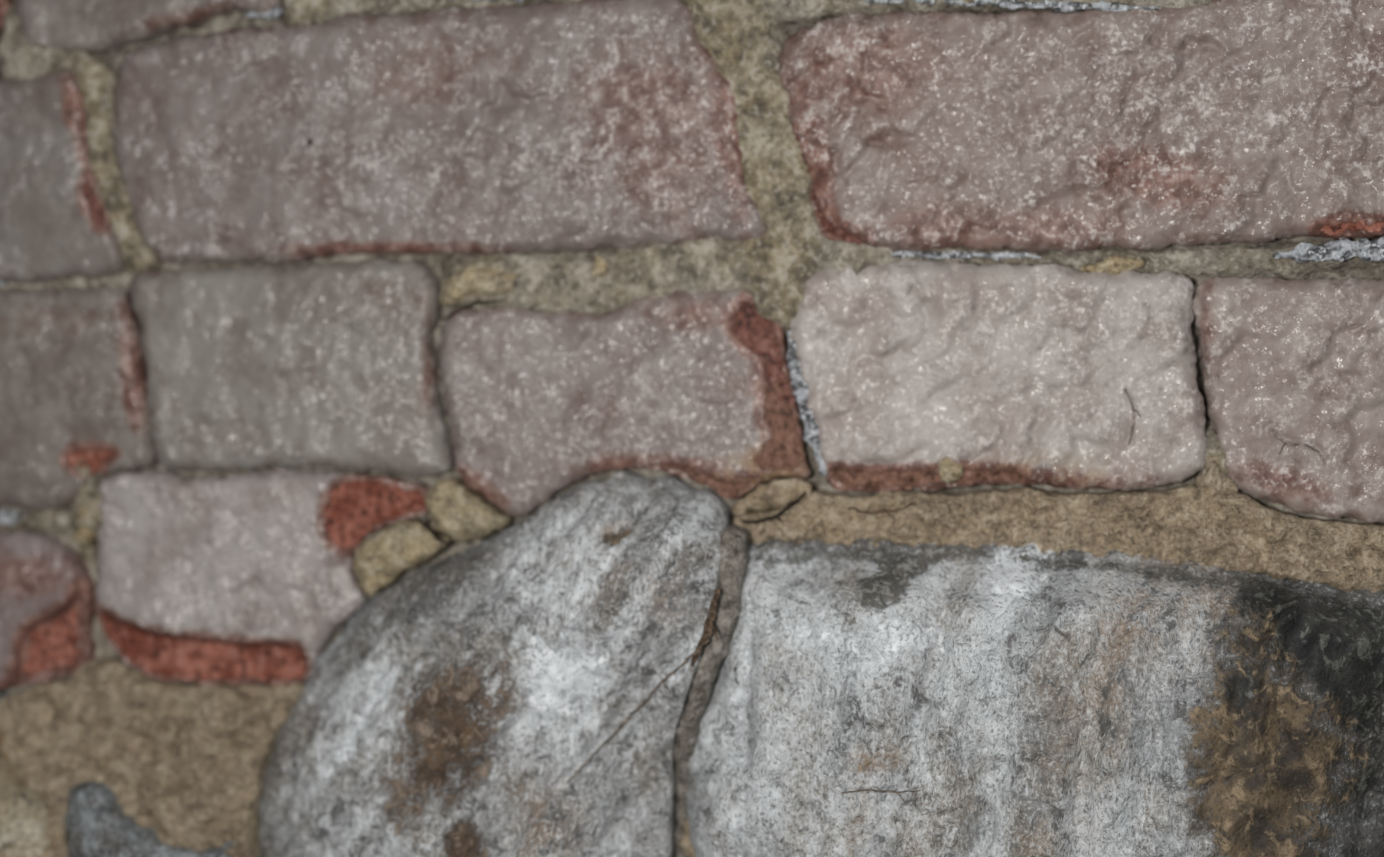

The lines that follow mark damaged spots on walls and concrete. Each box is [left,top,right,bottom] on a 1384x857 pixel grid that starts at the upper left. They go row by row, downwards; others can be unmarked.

crack [566,589,739,783]